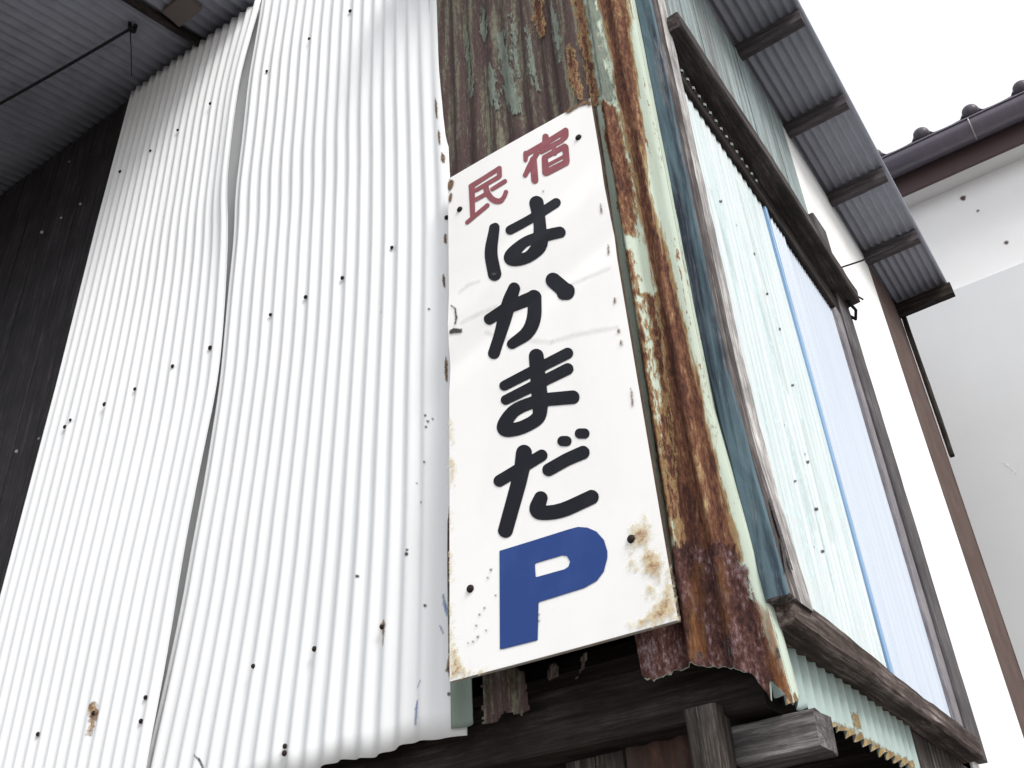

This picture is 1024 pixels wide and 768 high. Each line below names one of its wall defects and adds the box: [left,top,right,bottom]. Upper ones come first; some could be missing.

peeling [463,7,541,115]
peeling [550,0,563,63]
peeling [565,0,616,113]
rust [436,0,798,729]
rust [88,702,99,736]
rust [832,712,915,768]